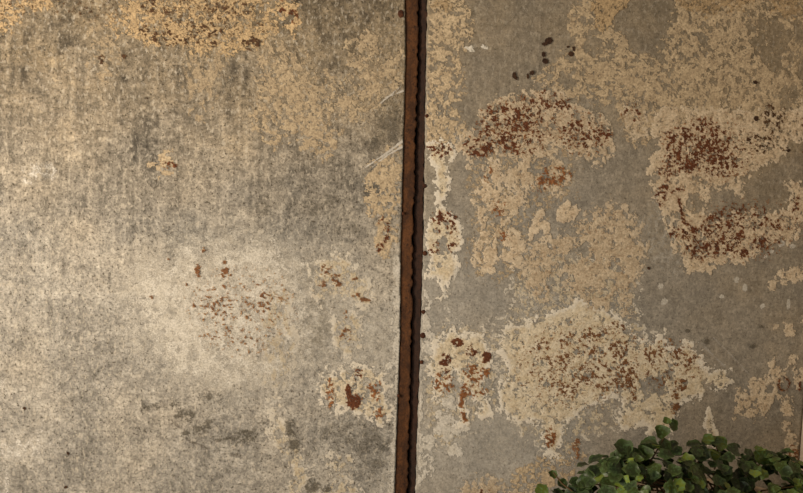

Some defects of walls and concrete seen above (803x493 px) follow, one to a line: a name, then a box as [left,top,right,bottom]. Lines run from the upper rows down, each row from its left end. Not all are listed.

peeling [0,0,56,36]
peeling [83,0,405,166]
corrosion [427,142,453,158]
corrosion [462,89,613,183]
corrosion [531,165,572,195]
corrosion [654,104,803,263]
peeling [418,0,803,493]
peeling [306,245,397,428]
corrosion [345,369,385,420]
corrosion [431,338,491,423]
corrosion [505,319,706,416]